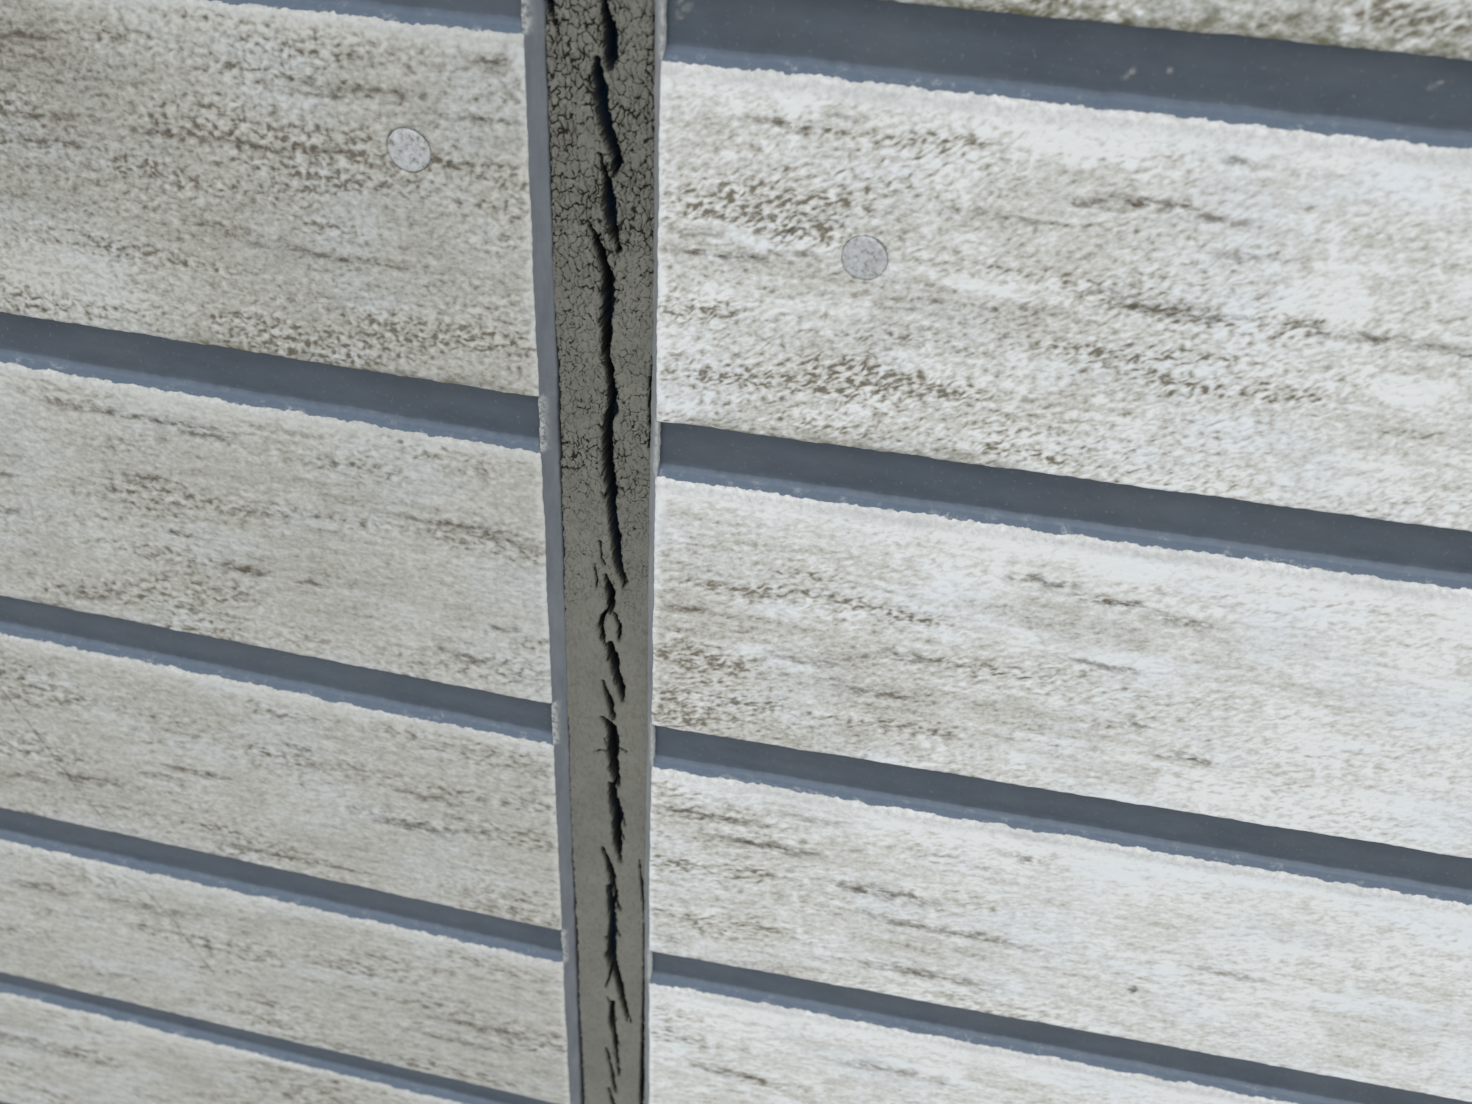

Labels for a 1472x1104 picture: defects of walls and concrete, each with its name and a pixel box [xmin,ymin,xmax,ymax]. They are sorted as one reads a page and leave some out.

crack [546,0,655,1104]